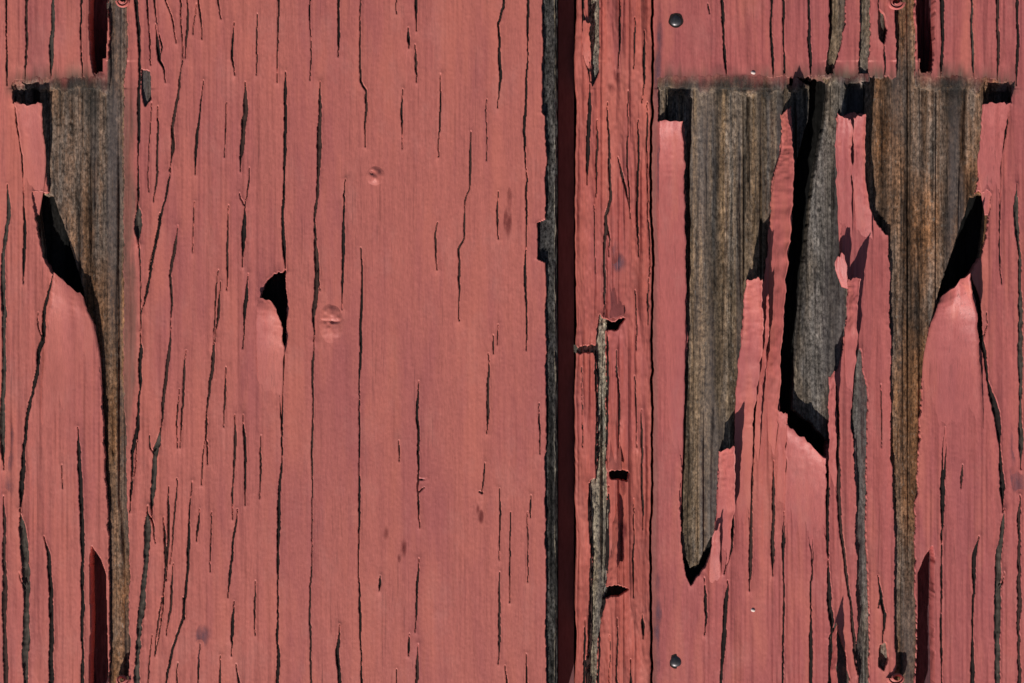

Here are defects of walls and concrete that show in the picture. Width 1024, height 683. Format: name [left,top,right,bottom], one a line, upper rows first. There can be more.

crack [0,0,55,683]
peeling [12,0,131,683]
crack [61,427,85,683]
crack [129,0,381,683]
peeling [256,270,287,416]
crack [434,0,530,350]
peeling [606,506,618,587]
peeling [608,440,622,471]
crack [581,0,650,683]
peeling [658,0,1015,683]
crack [940,440,963,683]
crack [970,0,1024,683]